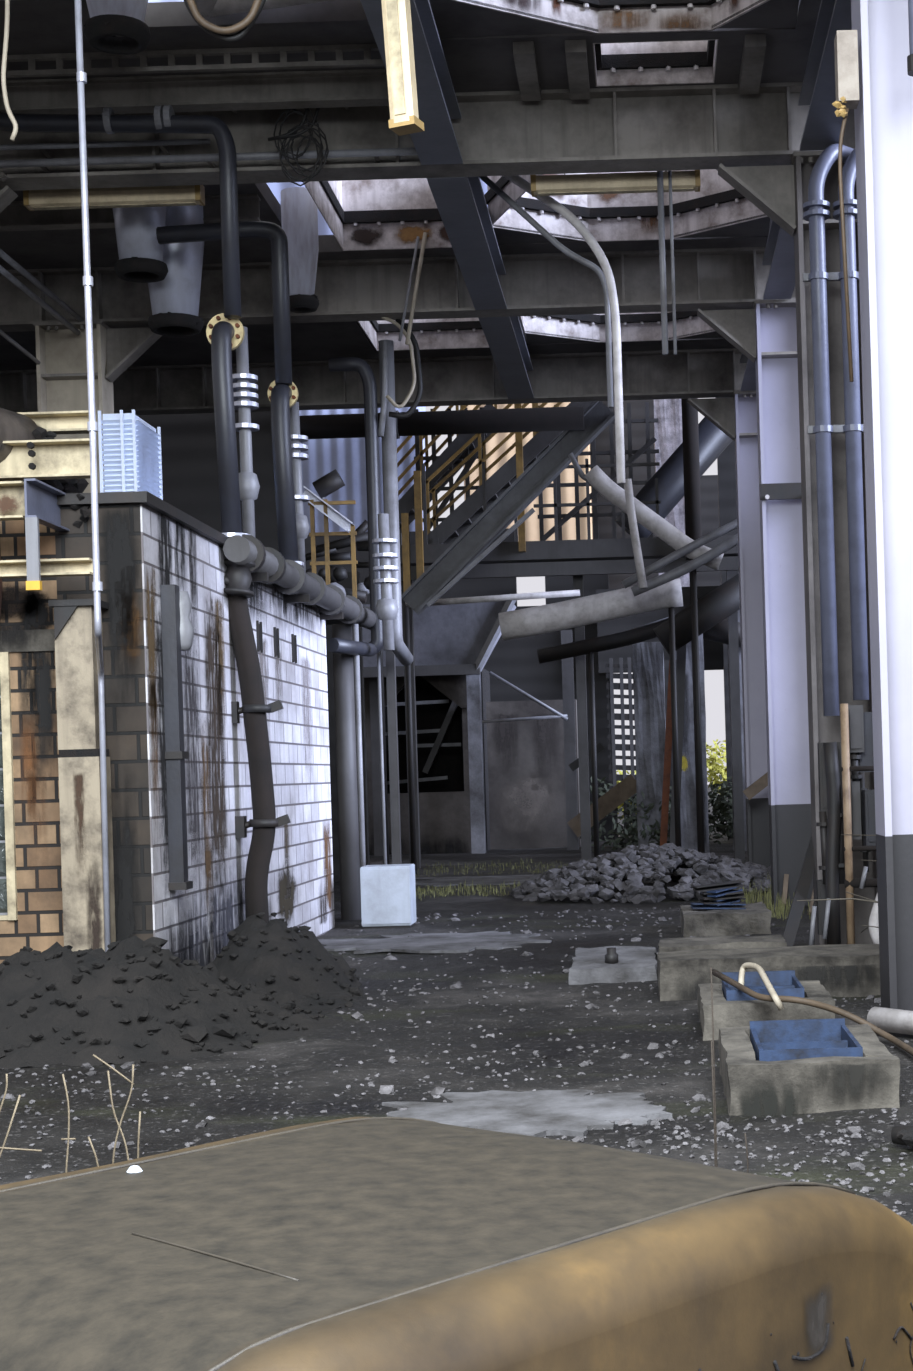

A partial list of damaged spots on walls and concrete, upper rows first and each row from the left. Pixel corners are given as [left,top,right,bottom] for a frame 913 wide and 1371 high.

rust [508,0,561,12]
rust [661,15,700,28]
rust [0,495,19,515]
damp [103,512,139,678]
damp [247,582,311,626]
damp [259,641,281,717]
damp [157,514,246,966]
damp [114,814,136,942]